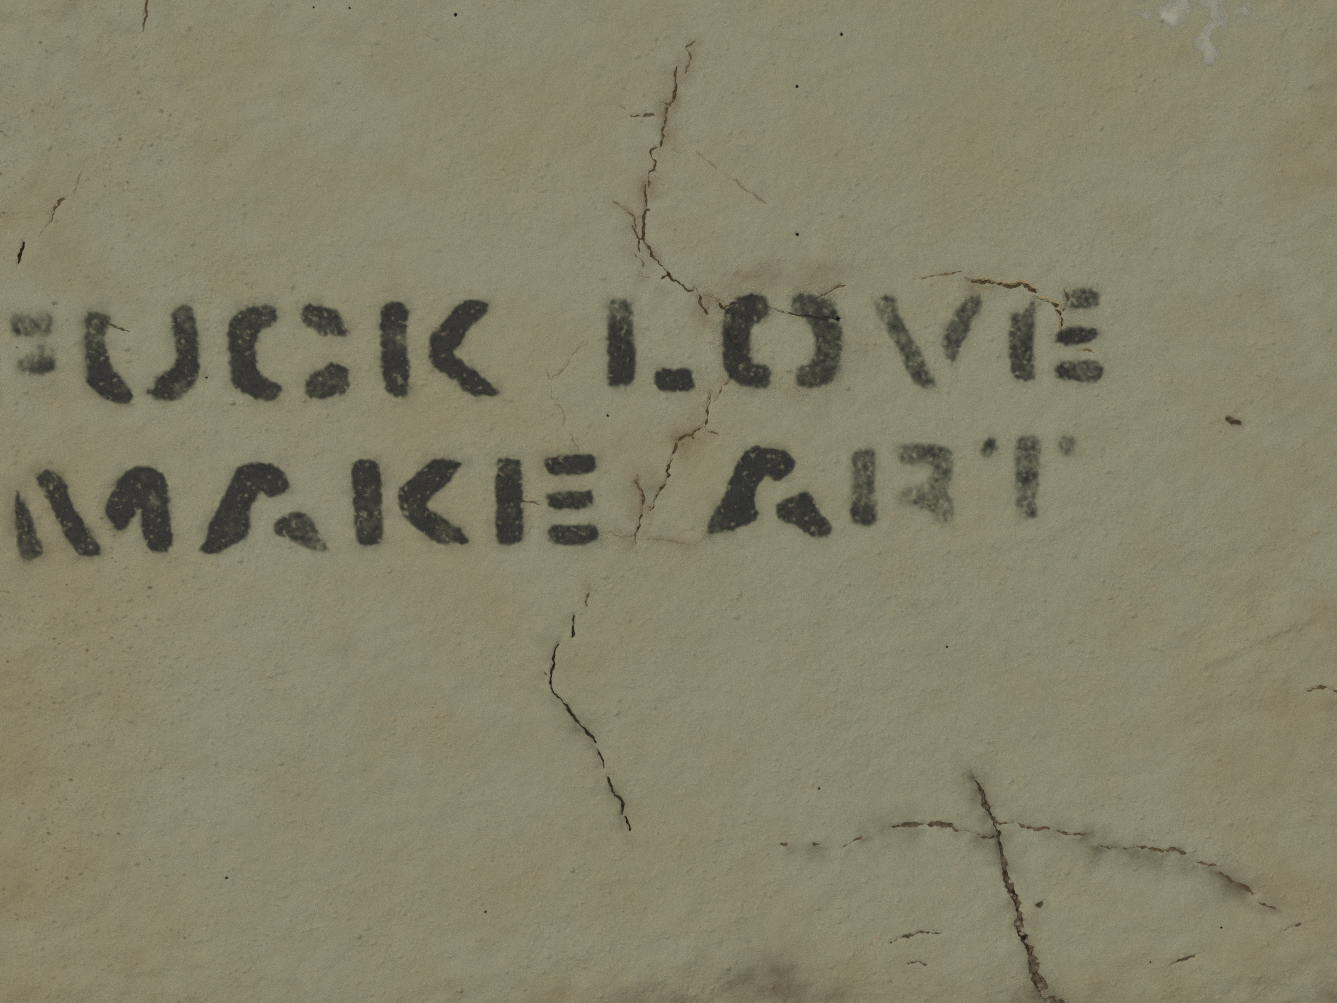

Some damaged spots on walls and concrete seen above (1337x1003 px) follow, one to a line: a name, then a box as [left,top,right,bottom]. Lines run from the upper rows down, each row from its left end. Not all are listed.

crack [613,41,739,348]
crack [768,285,845,319]
crack [920,271,1094,353]
crack [598,382,728,545]
crack [544,593,631,831]
crack [780,780,1301,1003]